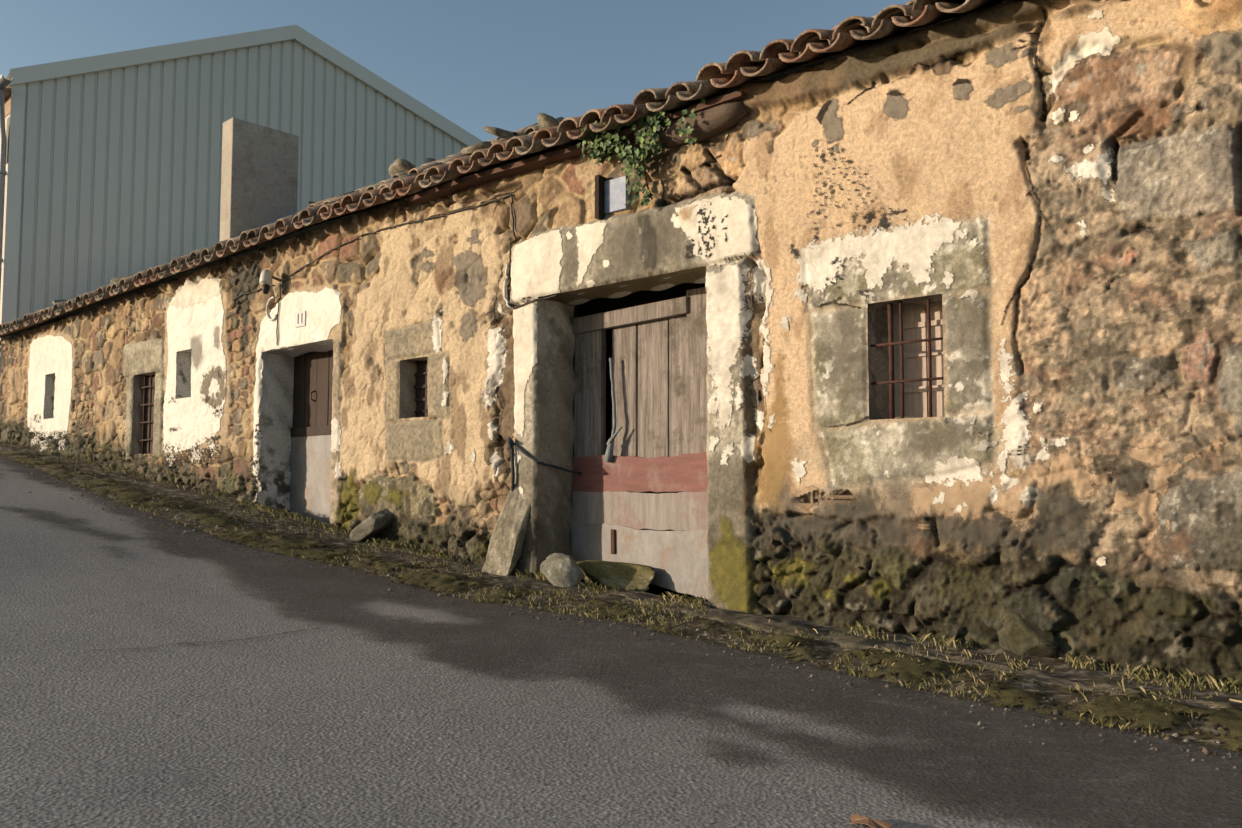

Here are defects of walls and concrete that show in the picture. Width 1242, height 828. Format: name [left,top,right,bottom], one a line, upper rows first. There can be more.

peeling [793,98,985,308]
spalling [882,89,911,119]
crack [847,48,976,105]
crack [1001,9,1047,373]
peeling [1048,144,1118,203]
spalling [1169,29,1242,123]
leakage [162,427,223,473]
peeling [163,275,228,467]
peeling [671,195,791,513]
leakage [754,360,904,552]
peeling [890,338,1231,543]
leakage [0,454,1242,828]